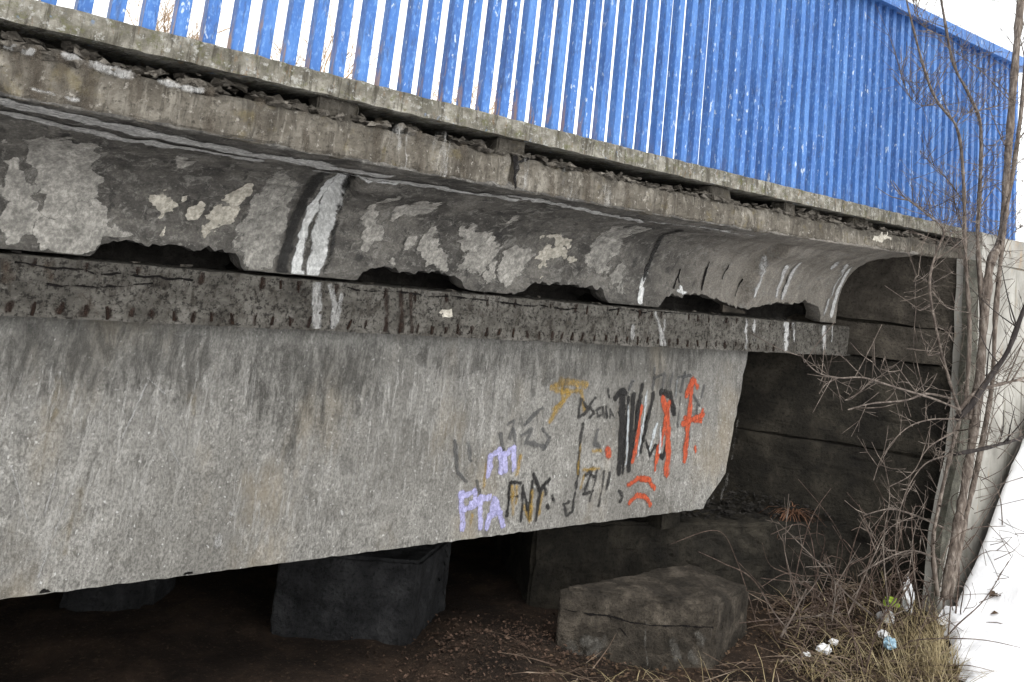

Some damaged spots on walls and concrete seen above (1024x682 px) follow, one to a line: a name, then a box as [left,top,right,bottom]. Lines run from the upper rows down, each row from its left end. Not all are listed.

peeling [0,136,304,270]
leakage [0,45,754,329]
crack [15,261,193,288]
crack [347,287,577,310]
peeling [329,196,652,305]
crack [609,262,743,315]
spalling [632,294,804,321]
leakage [754,256,767,297]
leakage [776,262,802,300]
leakage [822,262,852,349]